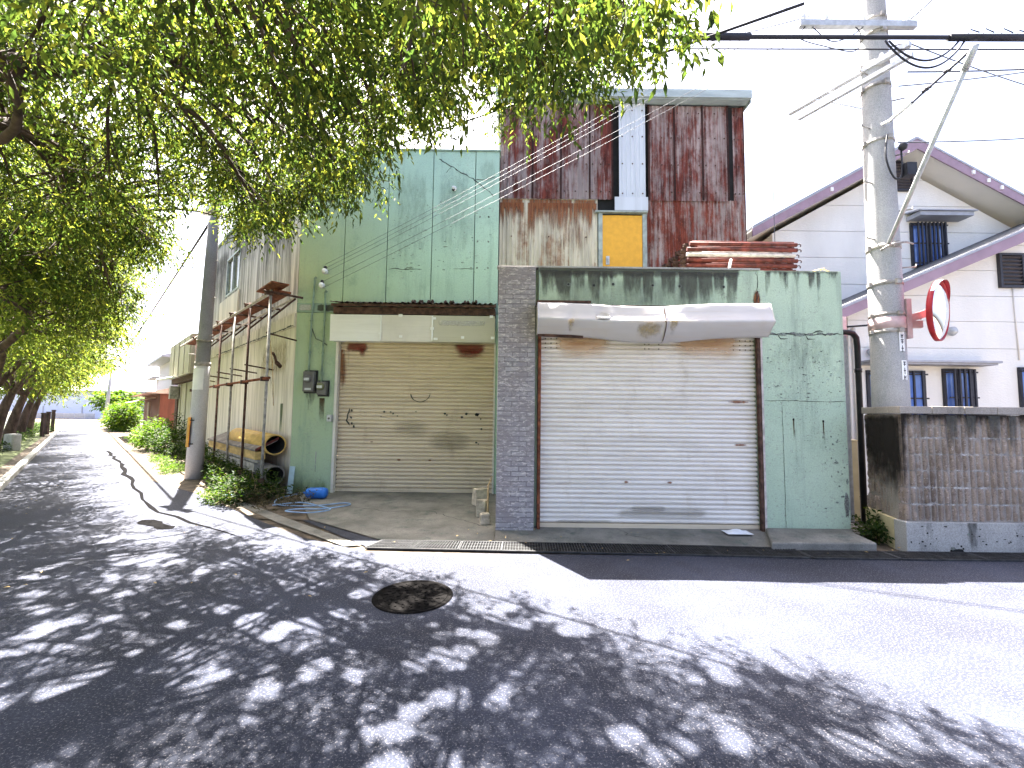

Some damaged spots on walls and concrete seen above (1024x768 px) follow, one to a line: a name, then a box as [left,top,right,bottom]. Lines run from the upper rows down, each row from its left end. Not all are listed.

crack [440,159,494,197]
corrosion [500,199,597,241]
damp [540,268,739,299]
damp [764,270,837,285]
corrosion [340,343,367,383]
corrosion [456,345,483,356]
crack [770,330,843,340]
damp [864,413,1024,483]